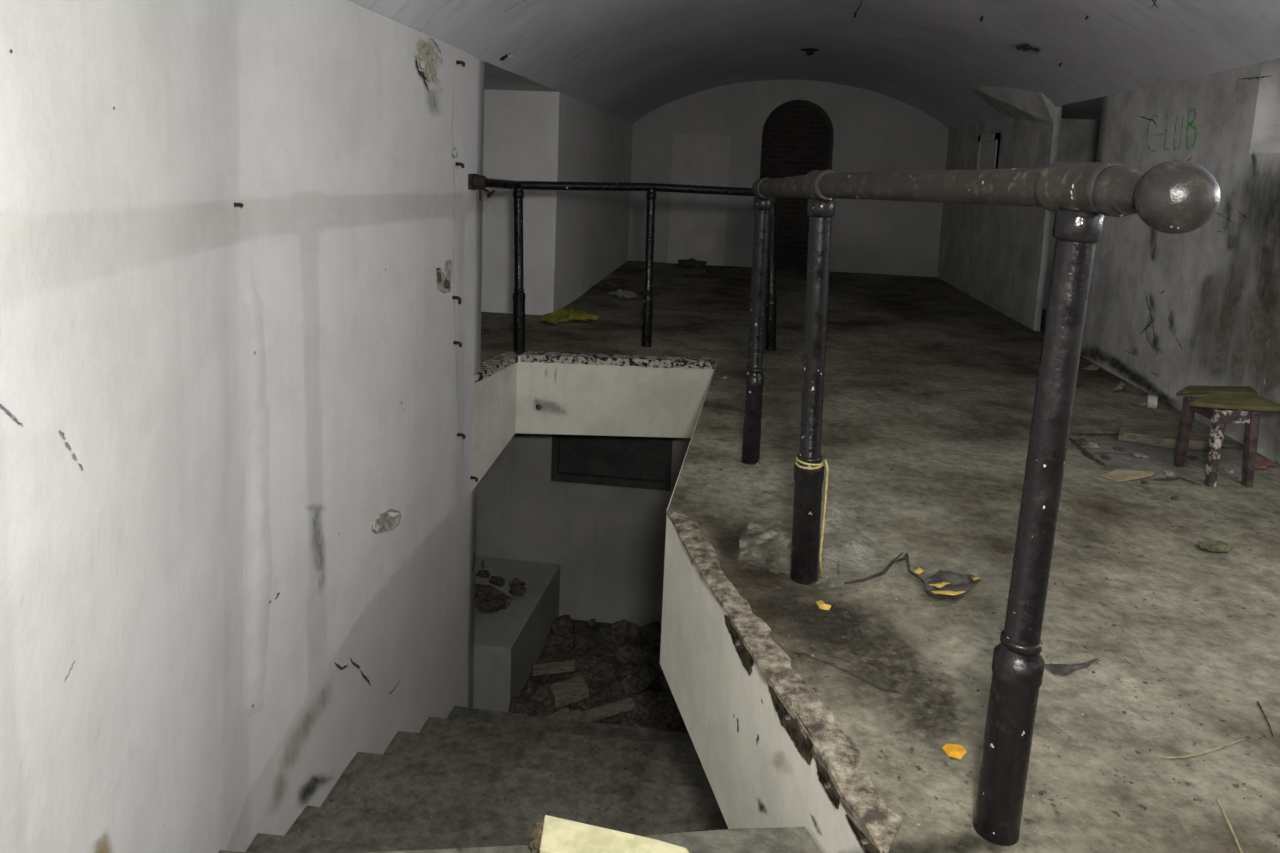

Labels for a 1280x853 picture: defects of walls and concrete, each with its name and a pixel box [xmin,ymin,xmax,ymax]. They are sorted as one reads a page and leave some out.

spalling [416,38,443,109]
damp [1194,181,1280,391]
spalling [371,509,401,534]
spalling [724,614,754,675]
spalling [761,679,885,853]